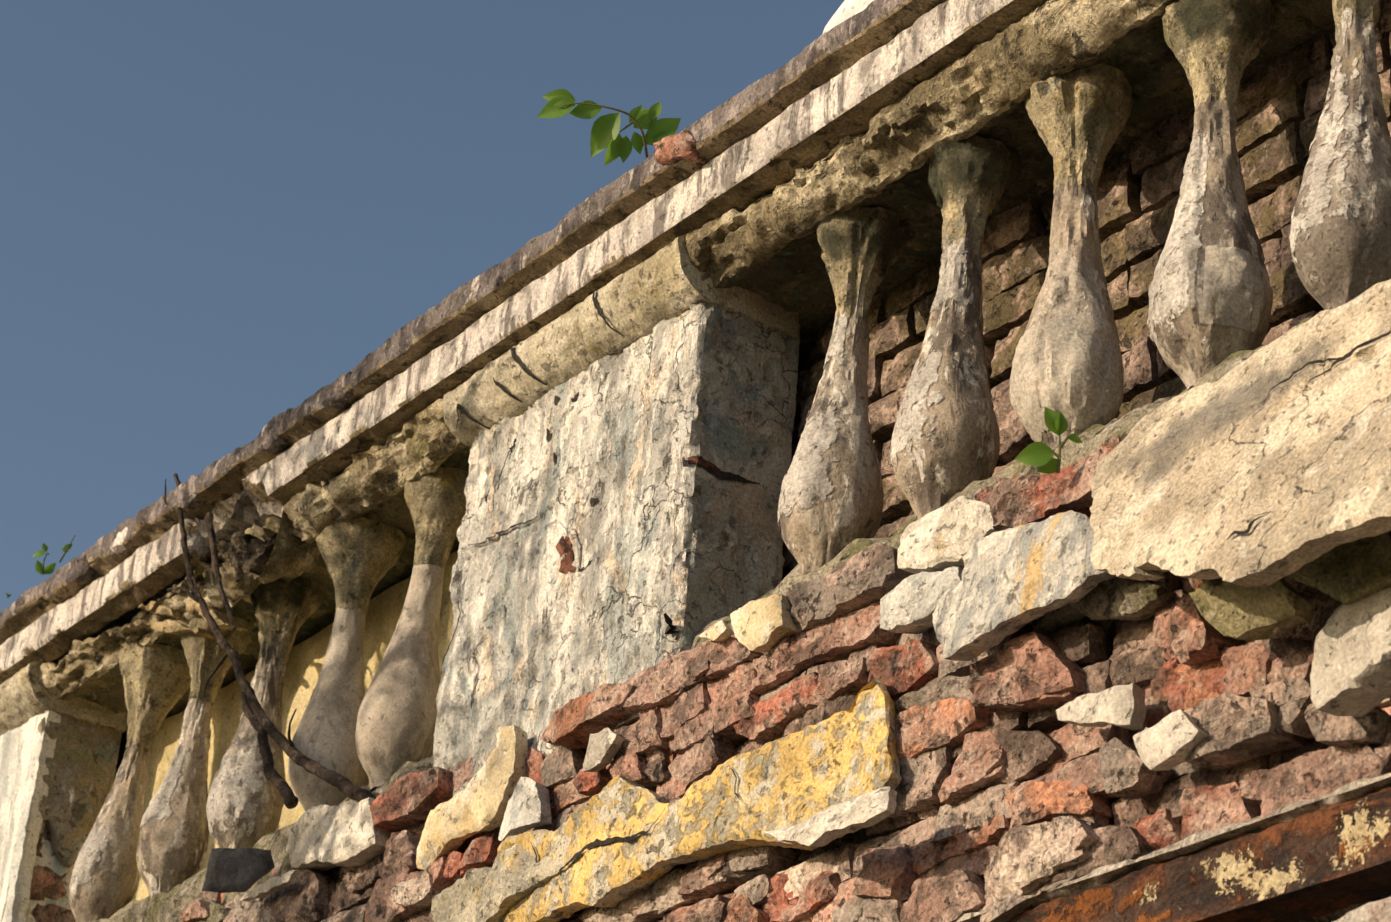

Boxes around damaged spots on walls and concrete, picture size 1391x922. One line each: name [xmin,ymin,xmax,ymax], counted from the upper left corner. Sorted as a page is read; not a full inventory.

crack [592,288,624,337]
crack [1263,330,1391,403]
spalling [322,371,355,409]
spalling [260,429,291,452]
crack [682,456,760,484]
spalling [73,554,99,581]
spalling [109,527,128,555]
spalling [216,514,281,582]
spalling [138,599,248,640]
peeling [206,741,266,837]
rust [1337,834,1372,861]
rust [1024,883,1174,922]